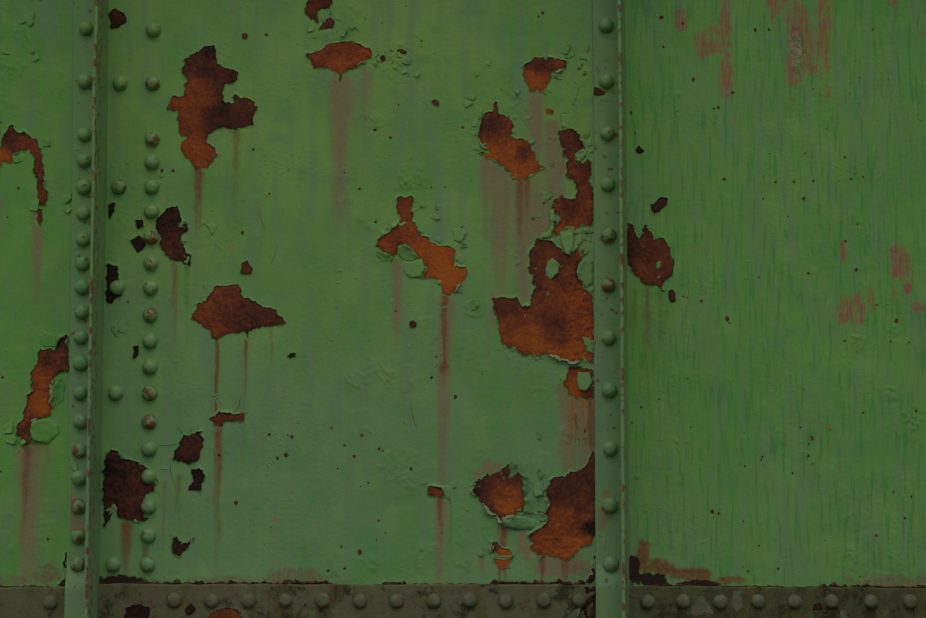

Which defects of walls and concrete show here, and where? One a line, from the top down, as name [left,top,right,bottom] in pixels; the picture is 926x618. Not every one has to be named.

rust [165,42,260,172]
rust [302,0,336,31]
peeling [303,0,442,83]
rust [520,42,575,95]
rust [0,117,51,228]
rust [126,204,194,268]
rust [104,261,129,307]
rust [189,258,288,344]
rust [2,331,70,447]
rust [373,99,596,618]
rust [100,393,248,529]
rust [99,561,431,585]